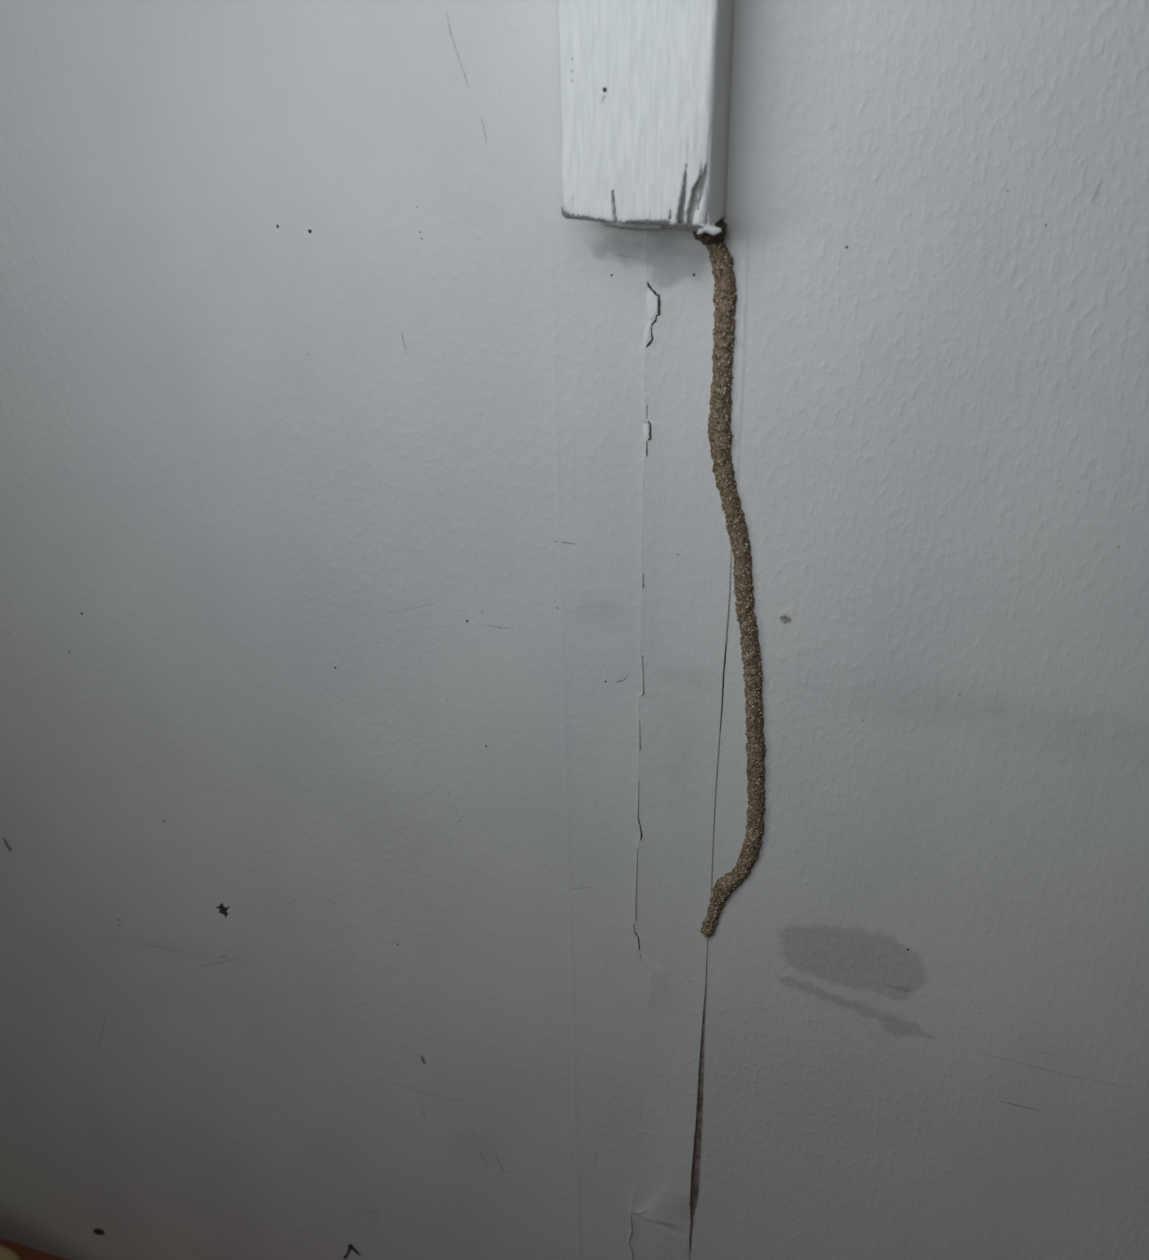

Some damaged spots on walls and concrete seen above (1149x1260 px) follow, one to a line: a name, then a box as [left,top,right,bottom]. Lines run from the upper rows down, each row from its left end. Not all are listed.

crack [731,214,750,479]
crack [711,555,732,895]